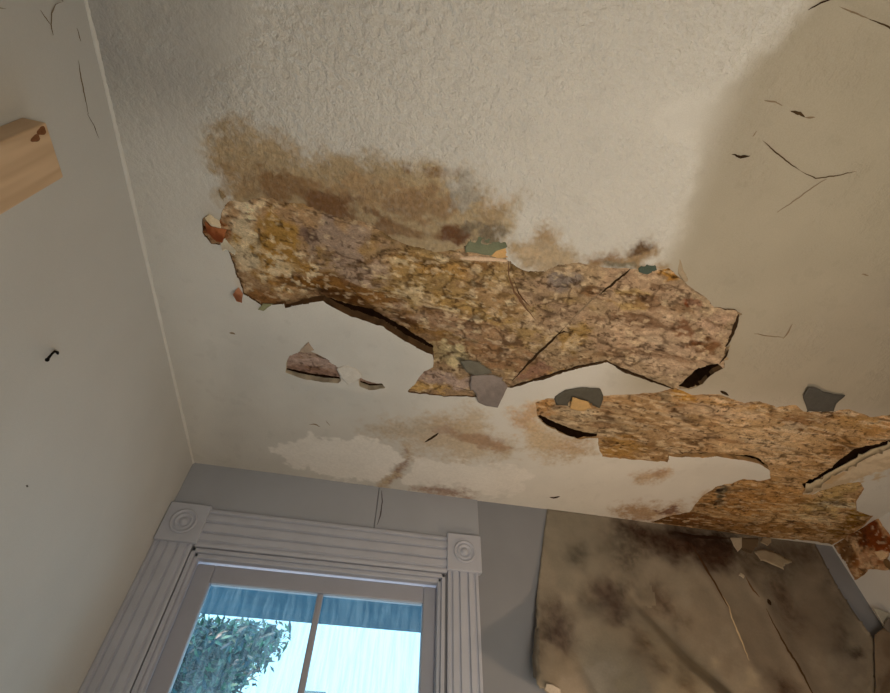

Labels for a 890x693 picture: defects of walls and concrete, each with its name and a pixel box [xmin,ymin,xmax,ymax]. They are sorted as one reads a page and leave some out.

crack [809,0,890,29]
crack [77,29,98,135]
crack [764,100,815,119]
water stain [188,104,677,275]
crack [732,131,852,212]
peeling [202,189,890,545]
water stain [338,392,606,501]
water stain [597,463,736,570]